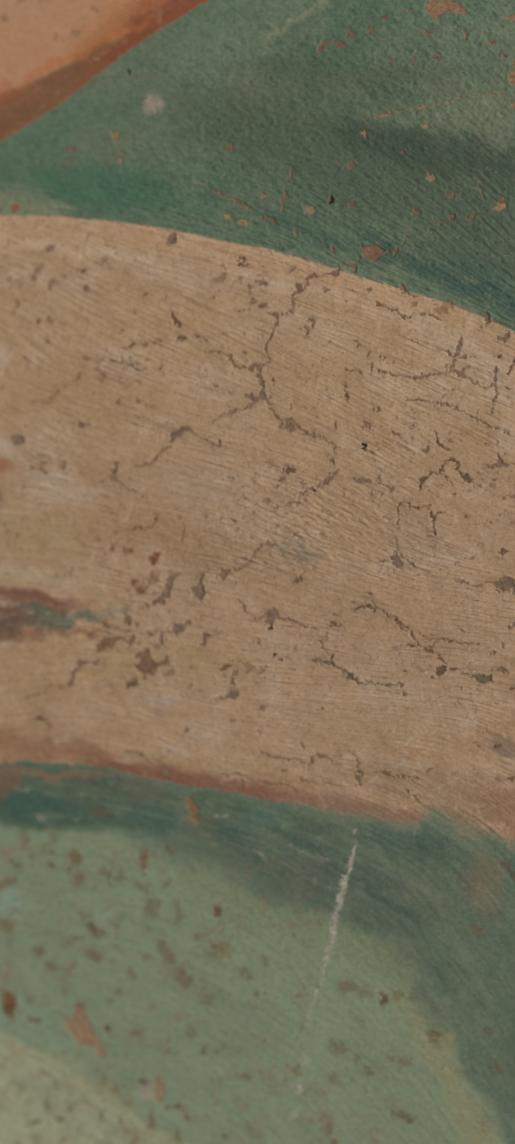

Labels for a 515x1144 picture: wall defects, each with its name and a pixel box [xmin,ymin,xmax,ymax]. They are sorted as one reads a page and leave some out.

peeling [408,0,466,36]
crack [31,258,360,532]
crack [344,336,515,537]
crack [390,544,412,569]
spalling [485,577,515,595]
spalling [86,614,174,689]
crack [147,621,191,645]
crack [239,601,402,687]
crack [353,593,469,677]
crack [217,664,264,700]
crack [218,743,431,790]
peeling [60,1004,110,1058]